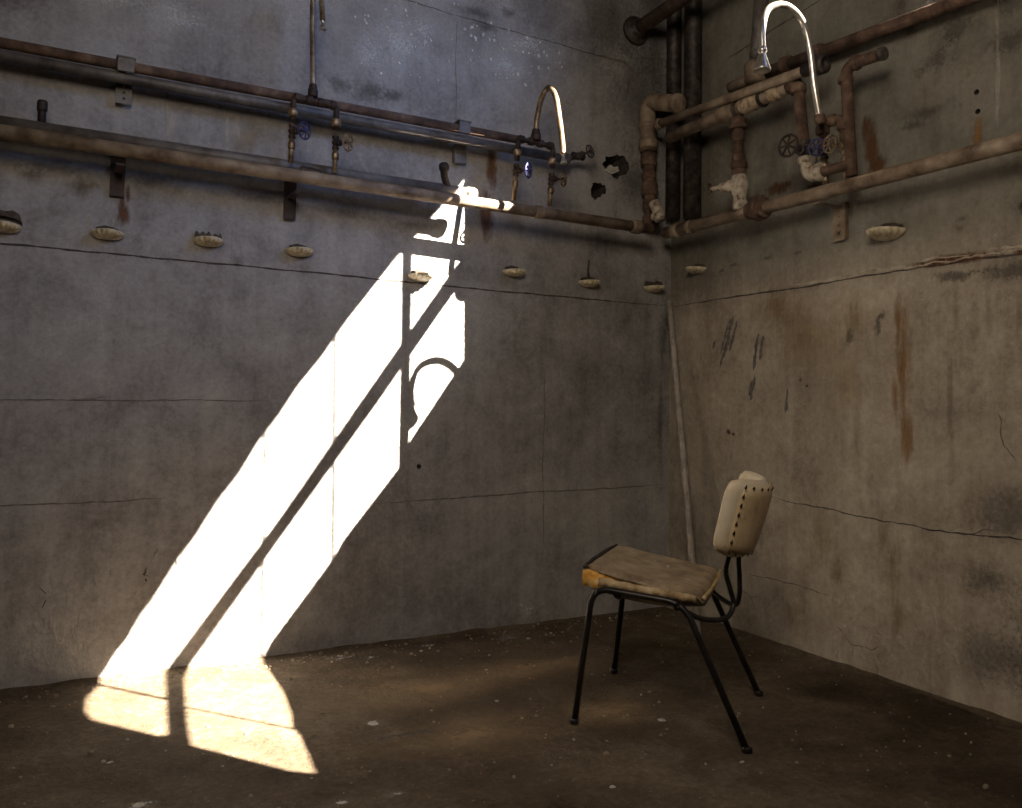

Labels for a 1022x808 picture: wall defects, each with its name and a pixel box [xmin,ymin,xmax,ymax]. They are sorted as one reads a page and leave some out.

spalling [591,155,629,200]
crack [0,243,1022,307]
crack [772,496,1022,540]